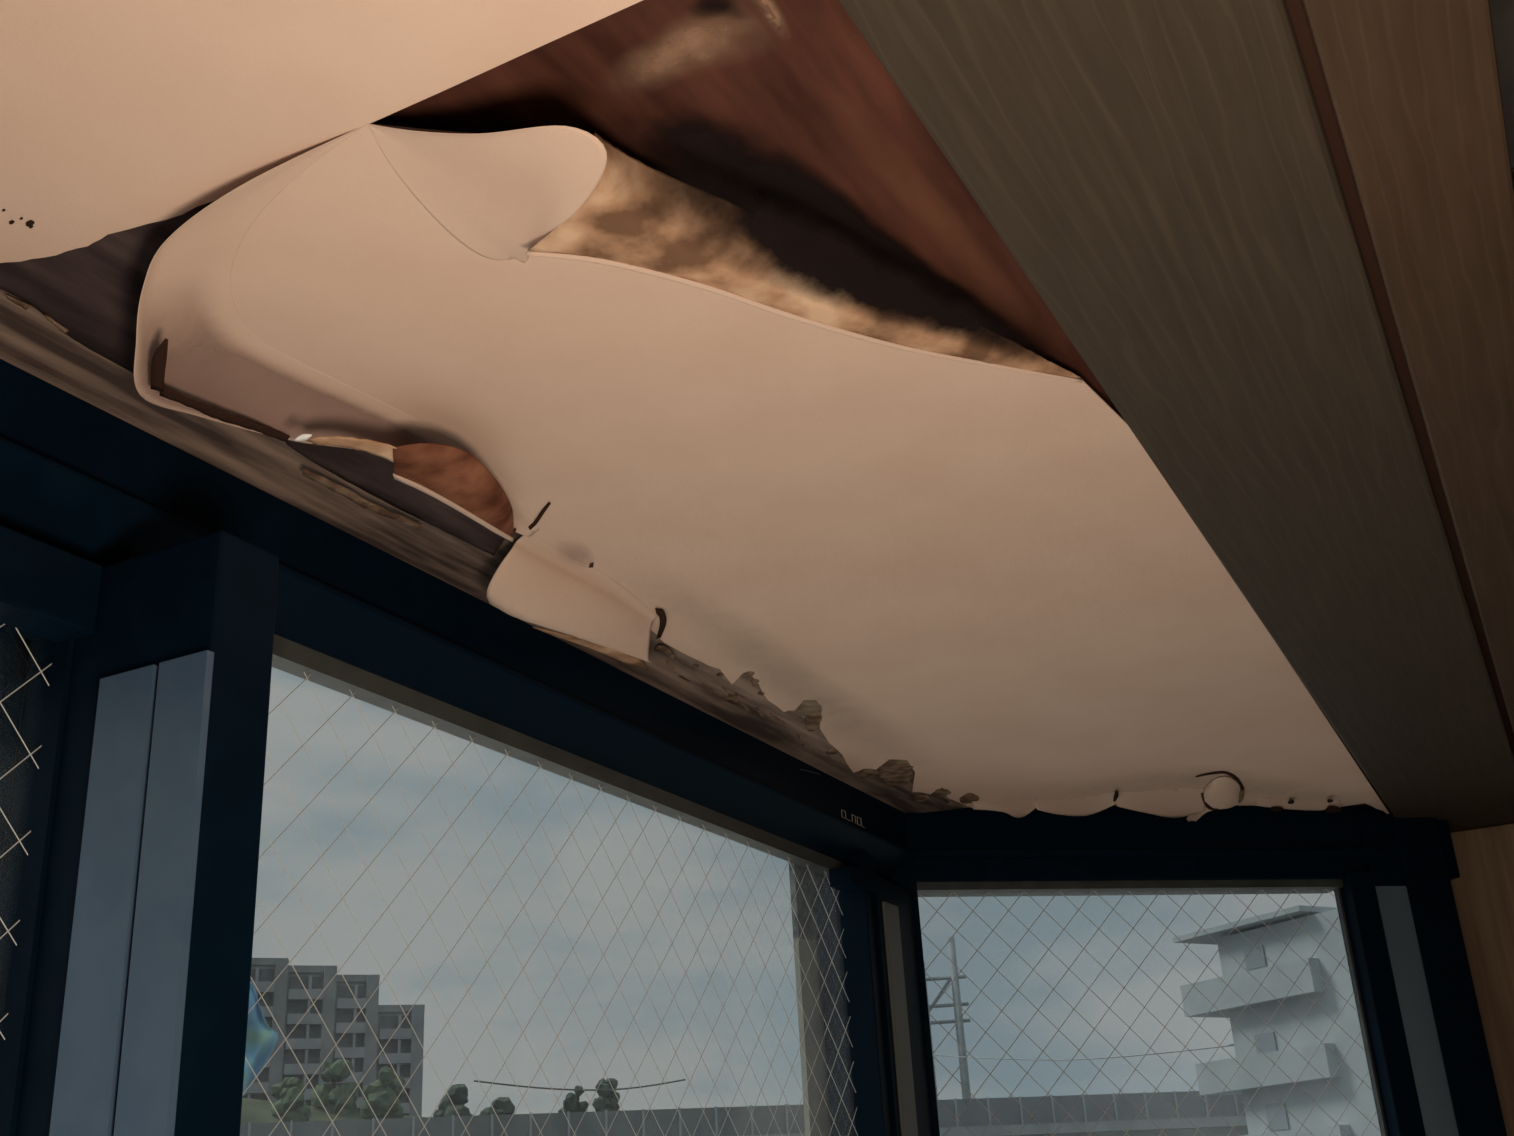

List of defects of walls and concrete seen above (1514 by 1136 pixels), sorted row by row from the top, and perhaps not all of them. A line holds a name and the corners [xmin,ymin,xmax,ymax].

leakage [648,122,1036,354]
spalling [286,434,505,556]
spalling [665,659,979,808]